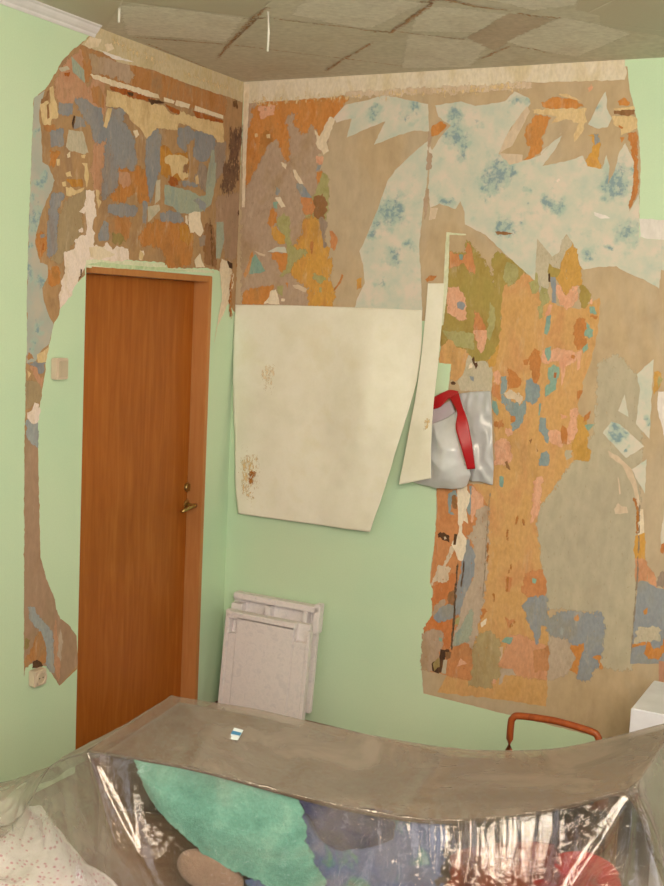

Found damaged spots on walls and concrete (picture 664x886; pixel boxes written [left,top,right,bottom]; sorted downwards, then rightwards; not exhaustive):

damp [320,0,560,40]
flaking render [40,86,58,125]
flaking render [56,152,144,309]
flaking render [81,0,664,342]
peeling [653,371,663,394]
peeling [420,236,606,706]
peeling [630,533,664,682]